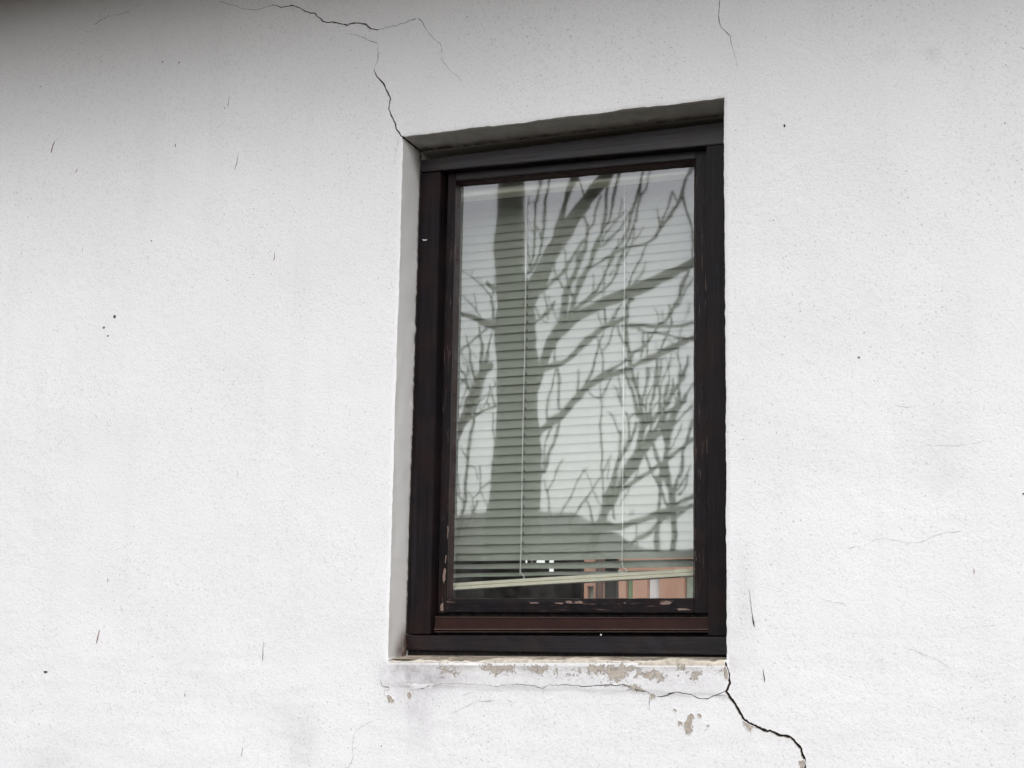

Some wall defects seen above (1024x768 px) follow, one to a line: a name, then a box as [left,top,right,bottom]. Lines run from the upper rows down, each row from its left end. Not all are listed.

crack [221,1,458,165]
peeling [481,661,729,700]
crack [418,662,806,768]
spalling [672,708,710,735]